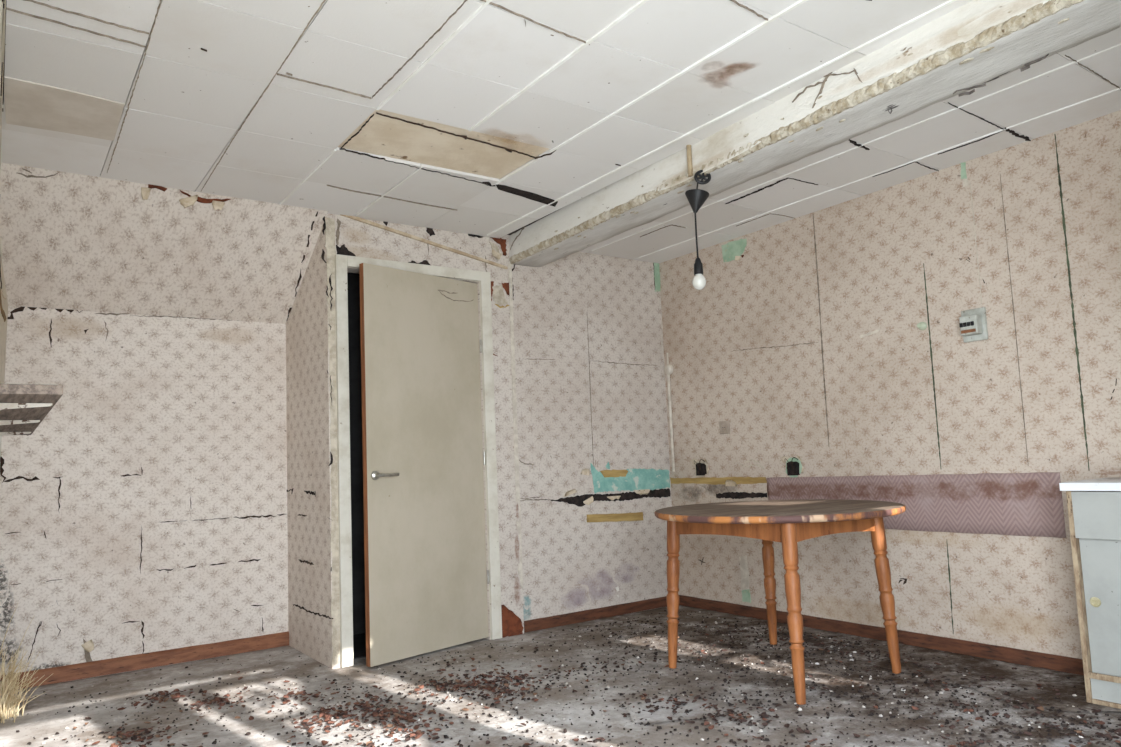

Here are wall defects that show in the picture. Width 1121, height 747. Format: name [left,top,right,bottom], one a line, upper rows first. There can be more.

crack [0,0,149,112]
crack [792,68,862,108]
spalling [468,0,1084,264]
crack [18,168,59,178]
peeling [141,184,231,210]
crack [0,265,238,347]
crack [0,457,61,537]
crack [140,497,307,573]
peeling [564,462,670,505]